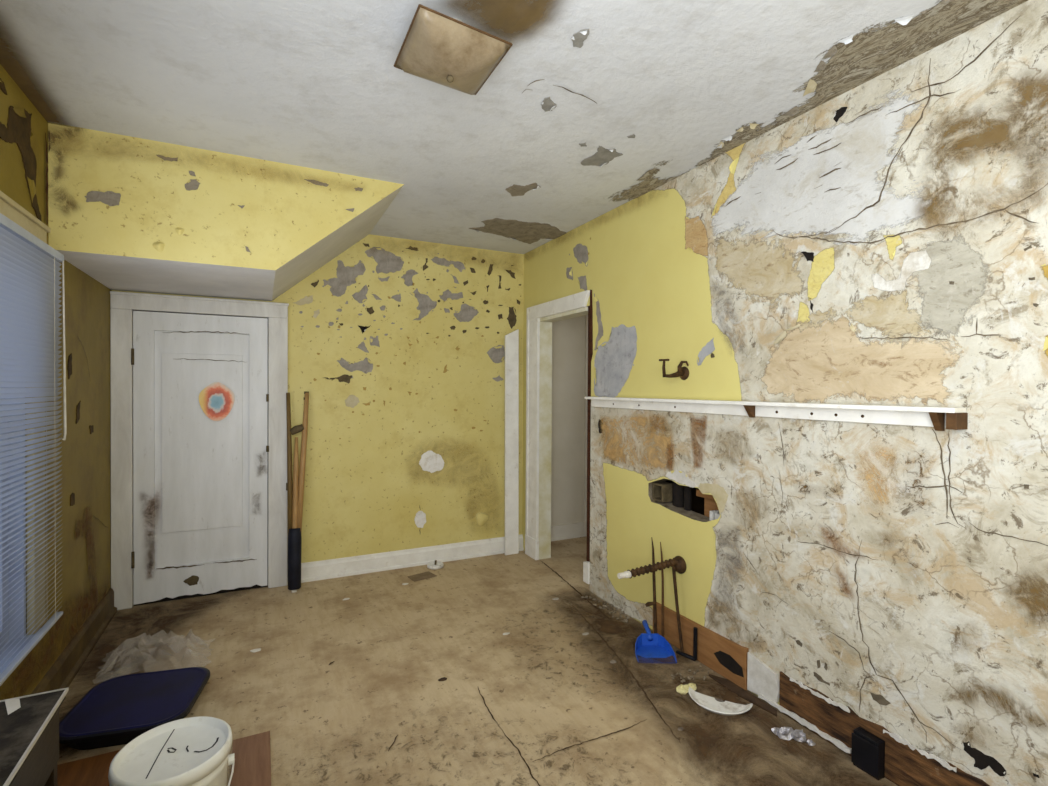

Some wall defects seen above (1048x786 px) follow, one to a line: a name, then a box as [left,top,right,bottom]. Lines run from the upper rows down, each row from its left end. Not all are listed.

peeling [0,78,42,222]
peeling [85,191,121,206]
peeling [185,171,200,191]
peeling [469,218,566,244]
peeling [505,183,541,197]
peeling [541,97,557,112]
crack [770,15,1047,244]
leakage [921,77,1048,221]
peeling [294,243,521,384]
peeling [566,0,1048,786]
crack [907,429,1048,546]
crack [798,541,961,750]